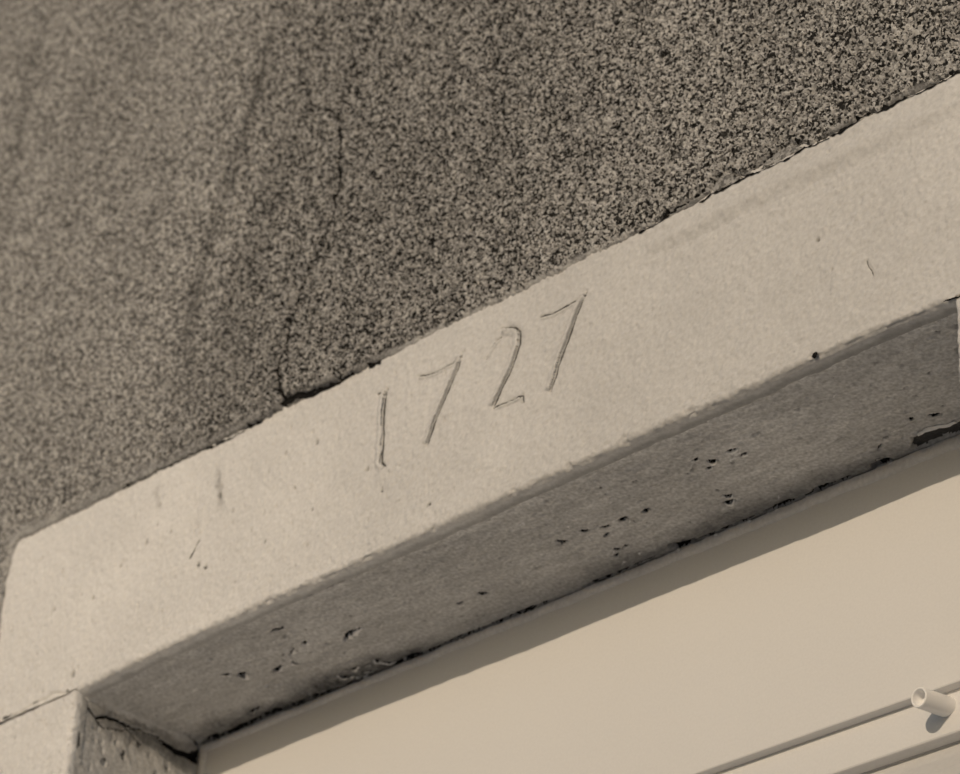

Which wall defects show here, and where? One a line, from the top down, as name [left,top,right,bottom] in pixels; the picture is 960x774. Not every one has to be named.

crack [269,0,384,401]